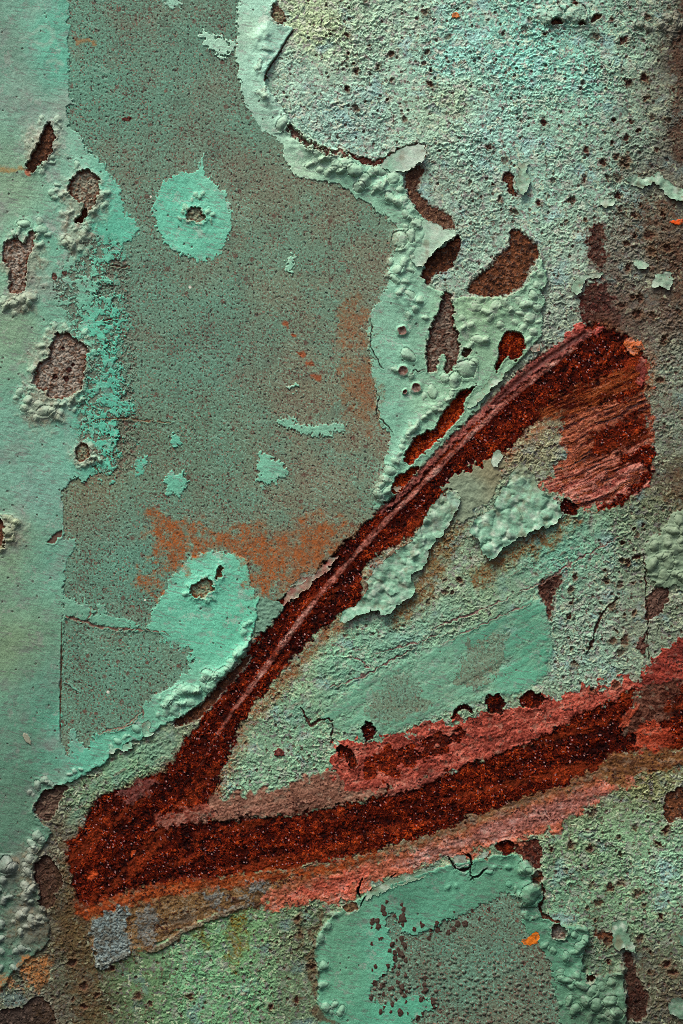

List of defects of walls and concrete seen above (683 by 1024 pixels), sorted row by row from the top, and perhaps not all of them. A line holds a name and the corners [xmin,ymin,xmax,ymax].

corrosion [614,171,683,318]
peeling [52,0,562,755]
corrosion [0,218,683,1024]
crack [300,707,335,746]
crack [447,851,489,882]